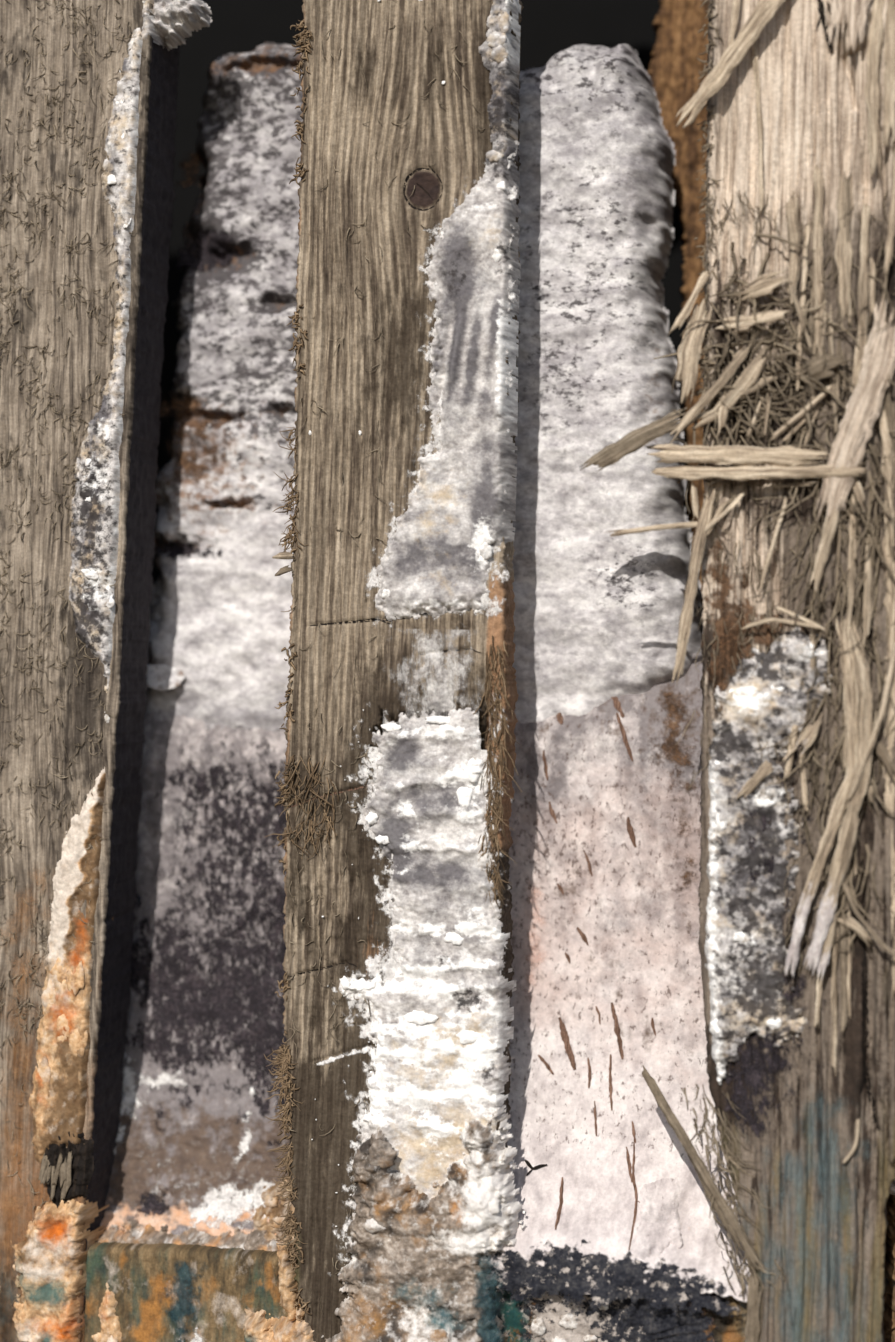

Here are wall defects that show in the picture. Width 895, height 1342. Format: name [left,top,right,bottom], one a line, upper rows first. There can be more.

corrosion [28,767,119,1163]
damp [114,739,288,1163]
corrosion [10,1199,110,1342]
peeling [91,1283,122,1342]